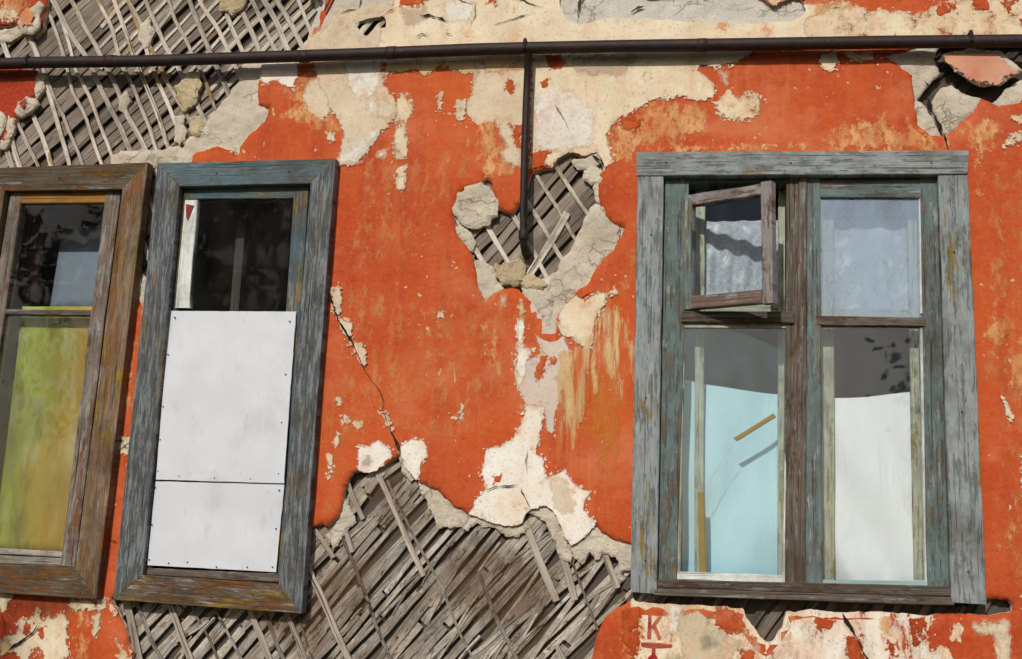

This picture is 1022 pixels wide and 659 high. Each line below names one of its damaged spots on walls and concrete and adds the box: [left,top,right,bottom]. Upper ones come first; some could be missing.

flaking render [0,0,1022,58]
flaking render [819,48,1022,168]
flaking render [0,55,525,306]
crack [330,294,401,455]
flaking render [114,51,954,659]
peeling [1001,337,1022,422]
peeling [0,593,14,616]
peeling [0,597,118,659]
crack [842,613,868,659]
peeling [948,622,964,643]
flaking render [973,599,993,614]
peeling [971,619,1011,659]